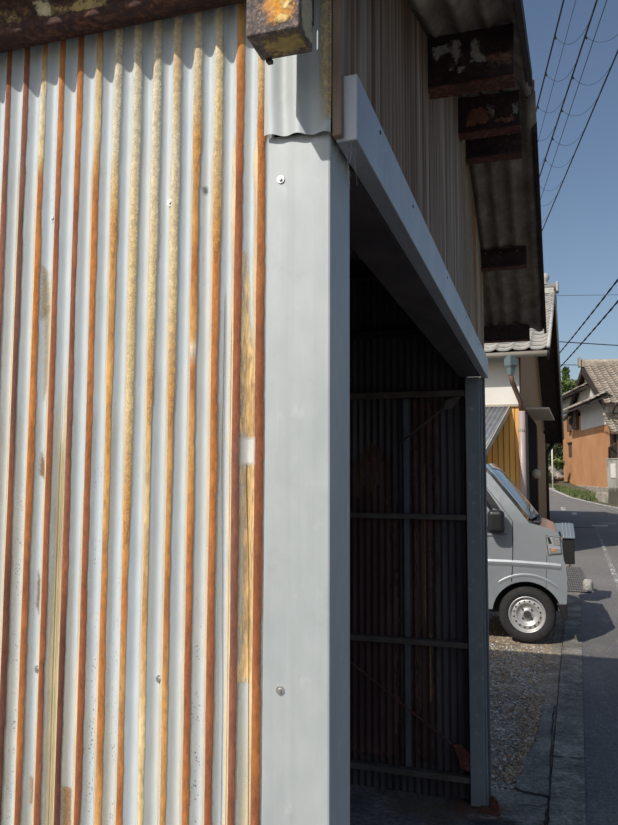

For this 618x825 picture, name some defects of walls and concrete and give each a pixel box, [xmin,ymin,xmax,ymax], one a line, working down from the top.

corrosion [0,47,30,825]
corrosion [13,40,66,825]
peeling [34,0,106,16]
corrosion [53,24,143,825]
corrosion [137,20,163,825]
corrosion [159,15,183,825]
corrosion [181,7,224,825]
corrosion [224,2,266,825]
corrosion [259,0,295,25]
corrosion [320,0,331,113]
peeling [432,39,512,73]